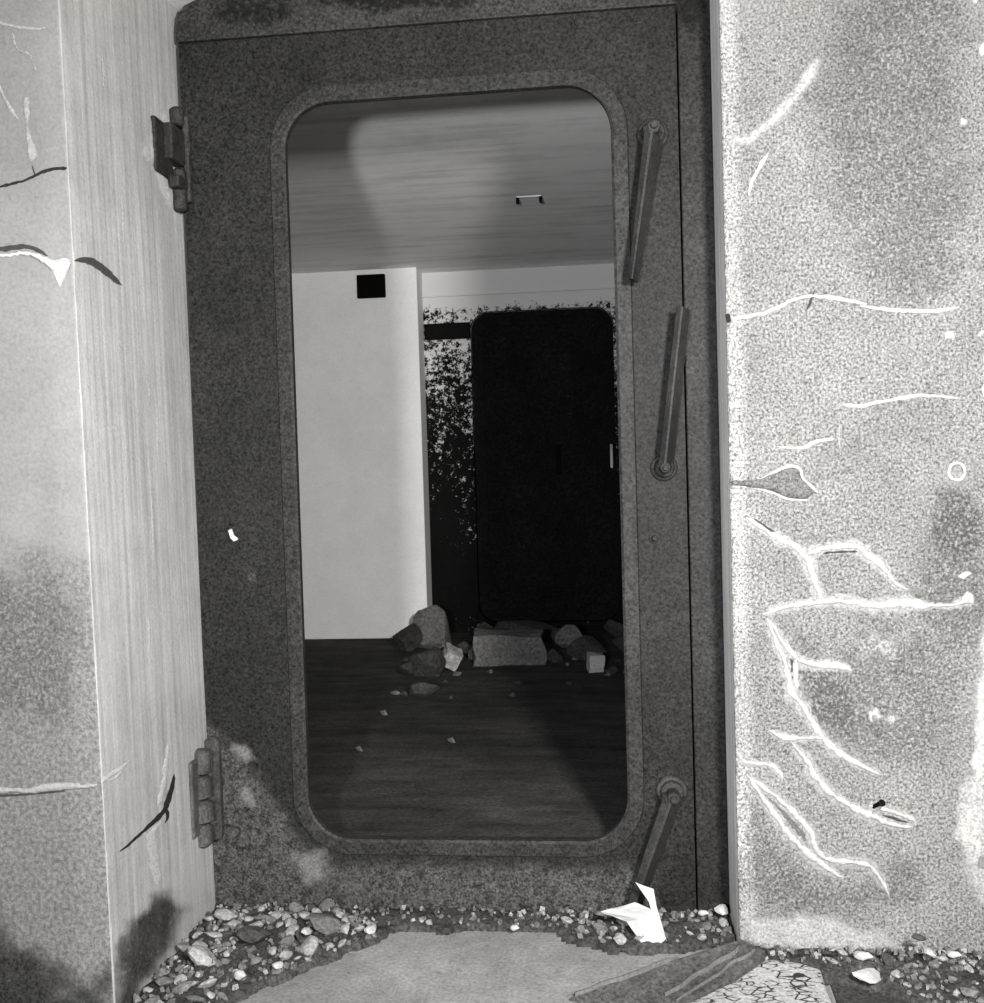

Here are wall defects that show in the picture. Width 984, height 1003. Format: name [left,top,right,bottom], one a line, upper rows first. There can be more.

crack [0,21,46,71]
crack [0,84,67,188]
crack [0,244,122,286]
crack [725,291,959,323]
crack [777,394,960,451]
crack [736,517,974,898]
crack [0,760,130,797]
crack [120,744,175,885]